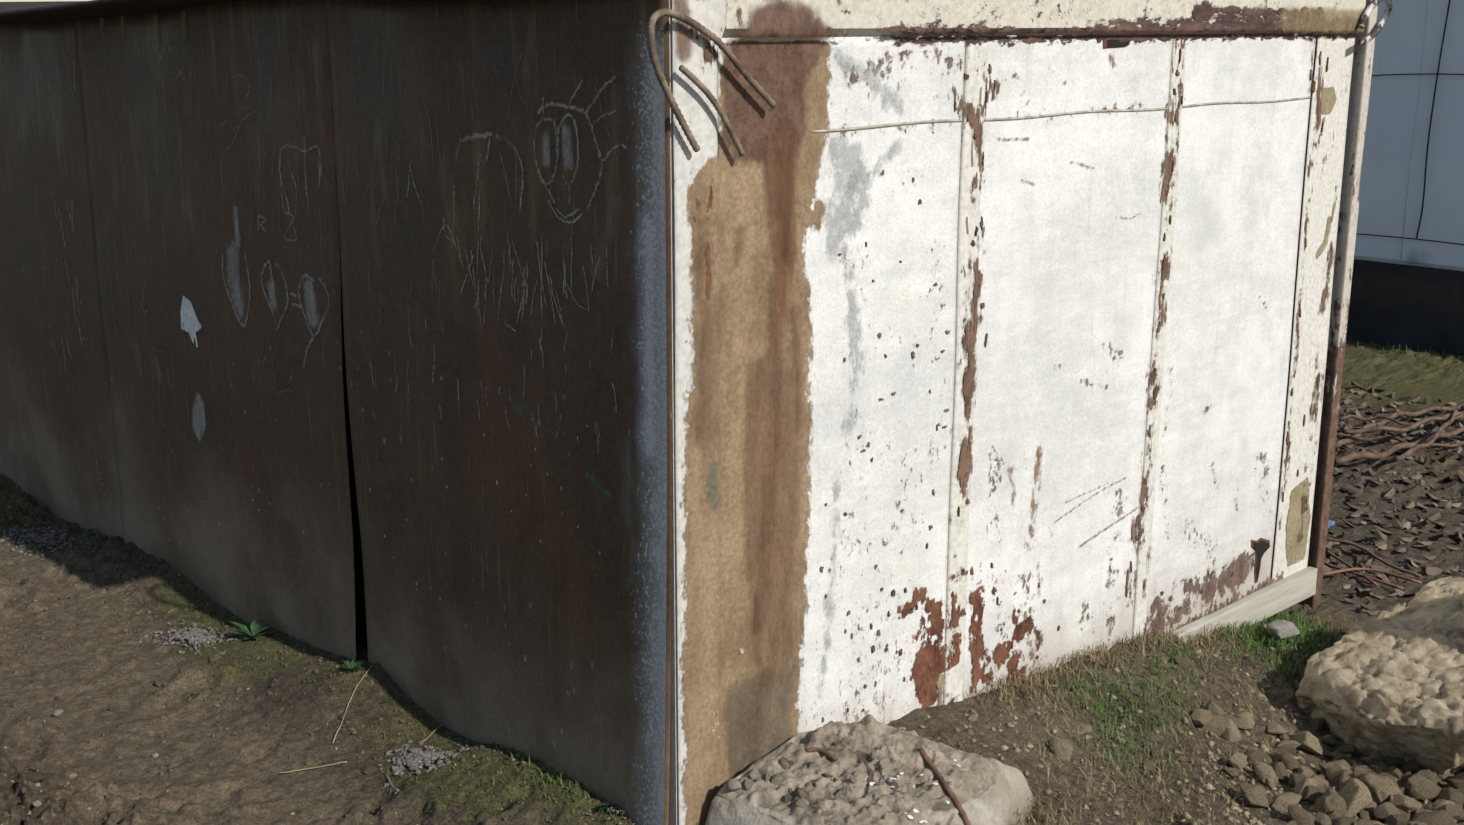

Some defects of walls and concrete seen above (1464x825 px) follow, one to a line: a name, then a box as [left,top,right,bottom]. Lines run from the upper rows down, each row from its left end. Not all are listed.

corrosion [675,0,1364,776]